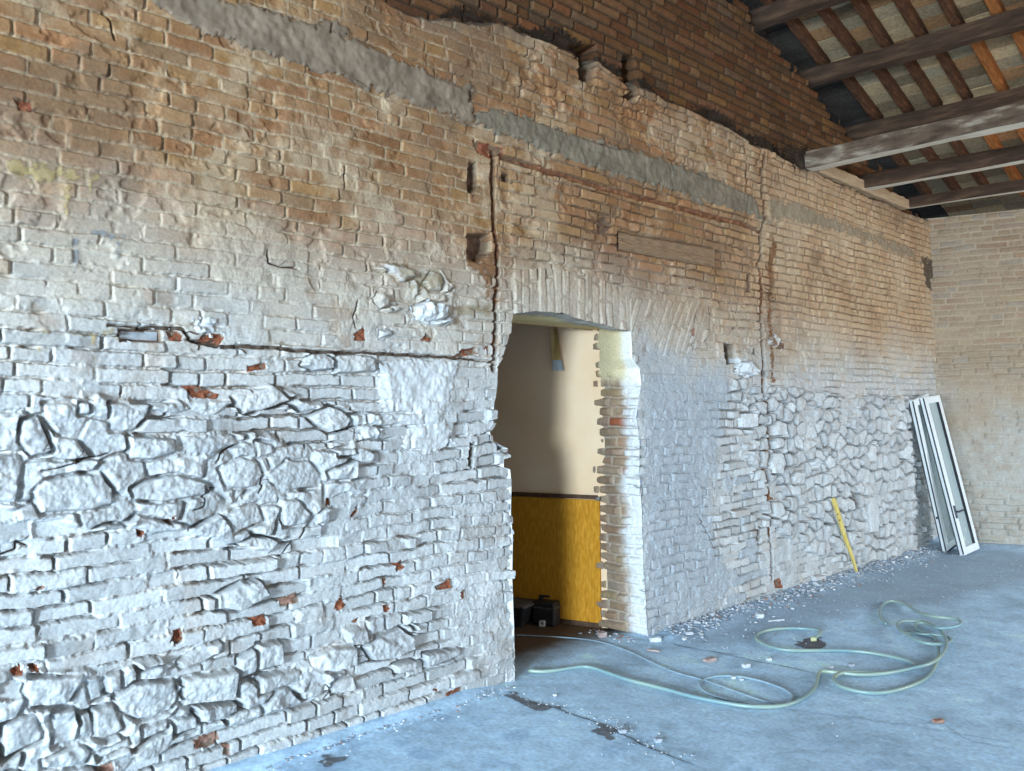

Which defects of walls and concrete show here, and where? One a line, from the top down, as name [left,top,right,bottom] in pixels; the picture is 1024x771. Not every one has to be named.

crack [106,303,486,362]
rust [757,235,778,383]
crack [42,436,107,471]
crack [0,535,29,554]